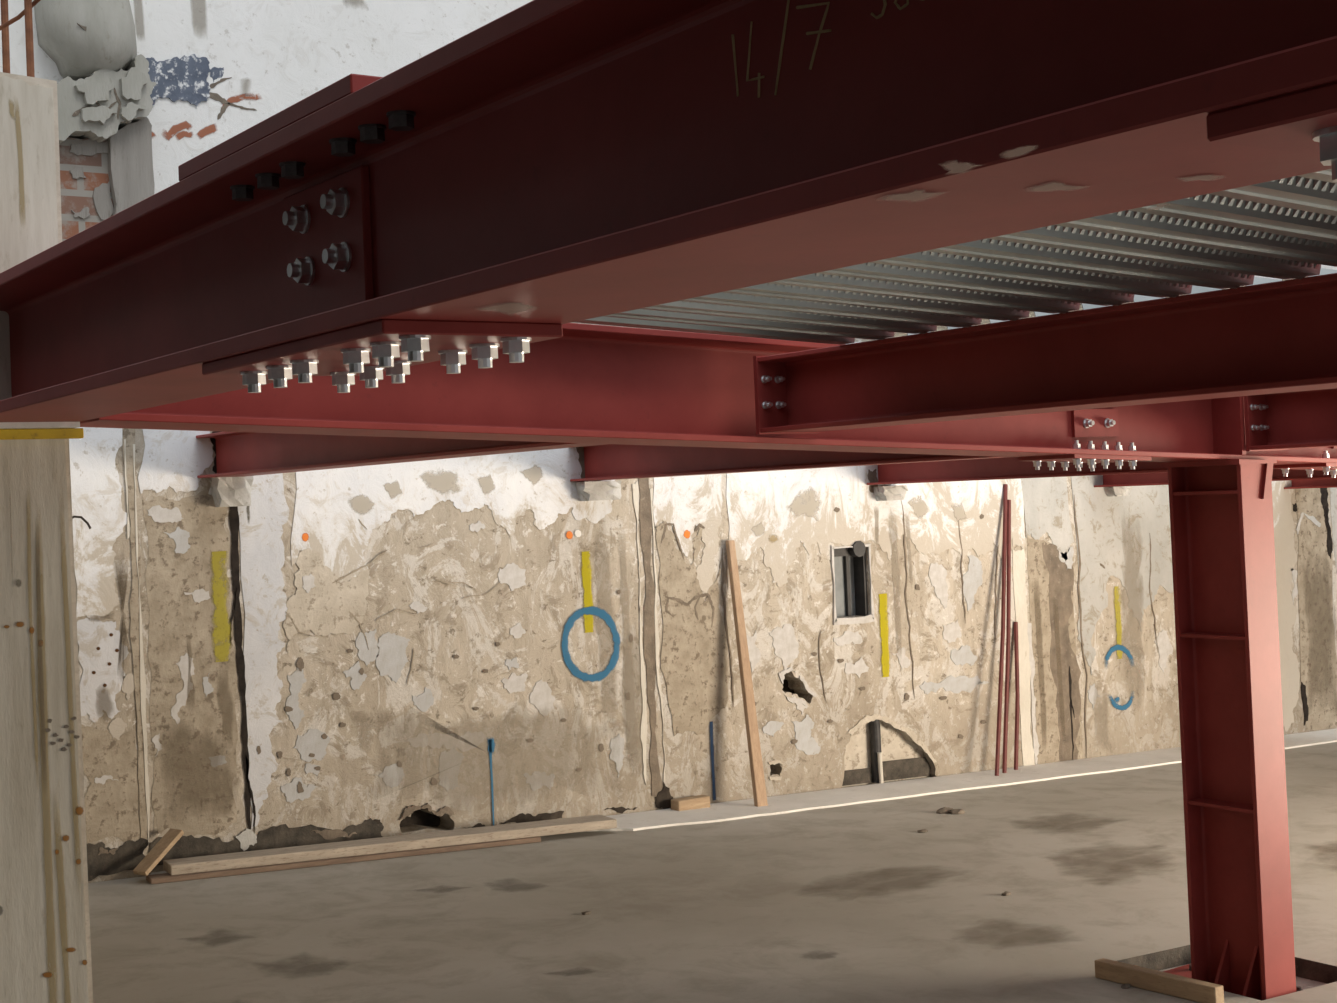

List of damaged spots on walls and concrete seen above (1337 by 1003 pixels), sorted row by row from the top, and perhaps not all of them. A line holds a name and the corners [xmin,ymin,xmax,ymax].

spalling [57,54,259,241]
crack [229,506,256,833]
spalling [48,427,615,881]
peeling [599,465,1173,809]